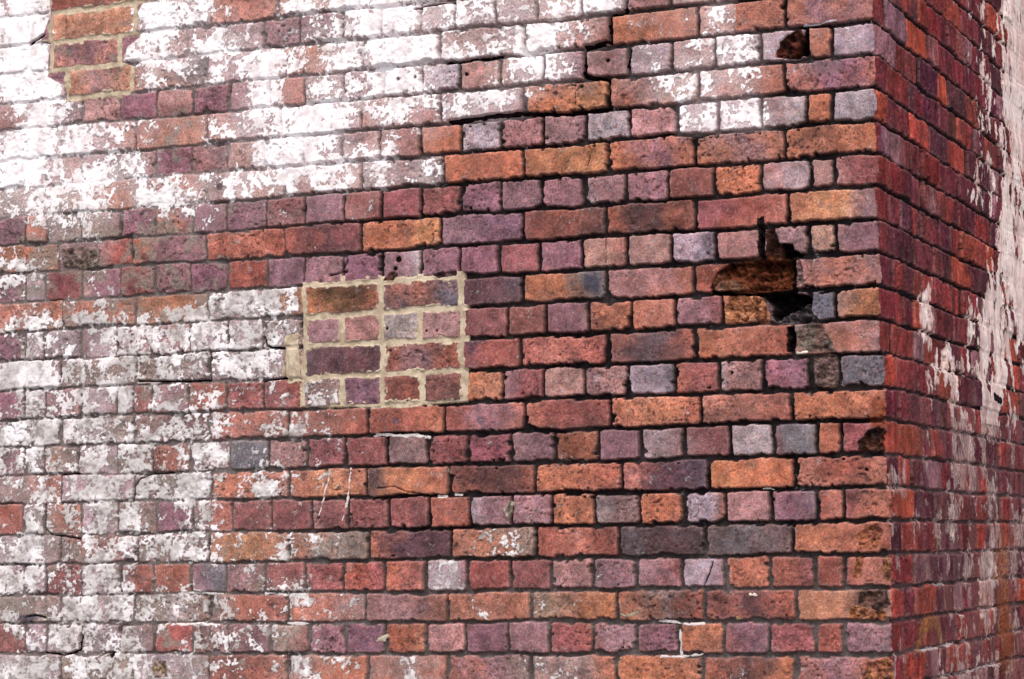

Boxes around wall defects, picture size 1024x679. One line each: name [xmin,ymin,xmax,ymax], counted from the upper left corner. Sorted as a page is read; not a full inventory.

water stain [967,0,1007,268]
peeling [0,0,811,679]
spalling [703,227,843,394]
spalling [857,426,887,453]
spalling [823,516,893,621]